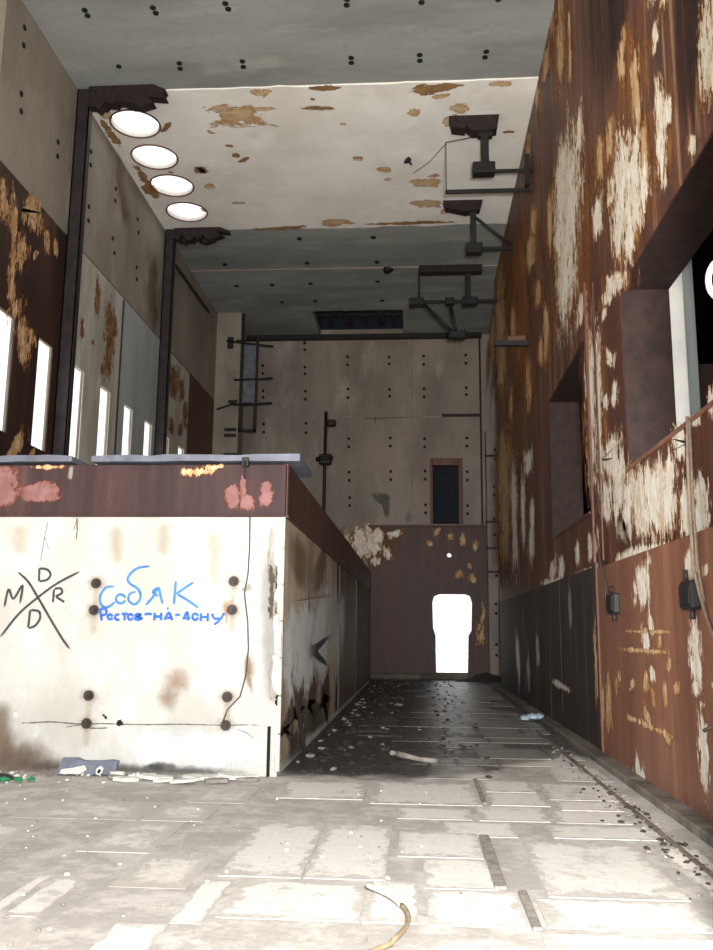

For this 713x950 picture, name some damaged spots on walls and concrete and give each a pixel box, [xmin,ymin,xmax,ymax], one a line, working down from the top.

peeling [412,83,470,127]
rust [590,0,643,158]
rust [676,0,697,113]
rust [569,163,593,320]
rust [80,271,119,383]
rust [511,214,531,401]
peeling [485,0,713,807]
peeling [0,425,67,511]
peeling [179,464,224,478]
peeling [223,471,274,511]
peeling [340,523,405,568]
leakage [283,585,331,703]